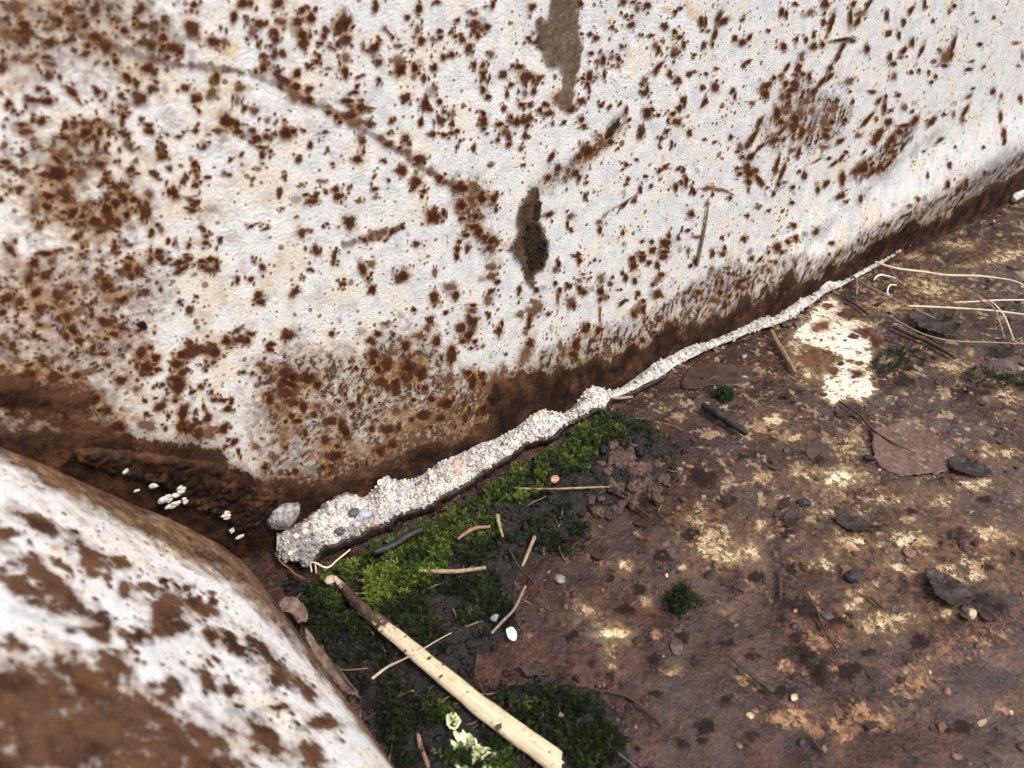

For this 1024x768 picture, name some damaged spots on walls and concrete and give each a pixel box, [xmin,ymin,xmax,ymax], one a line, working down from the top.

corrosion [0,0,185,128]
corrosion [183,0,771,207]
corrosion [702,0,979,205]
corrosion [137,116,212,213]
corrosion [377,116,508,262]
leakage [984,346,1019,358]
leakage [680,527,701,543]
corrosion [0,510,343,768]
leakage [615,582,647,614]
leakage [829,612,858,628]
leakage [837,648,882,681]
leakage [677,718,714,750]